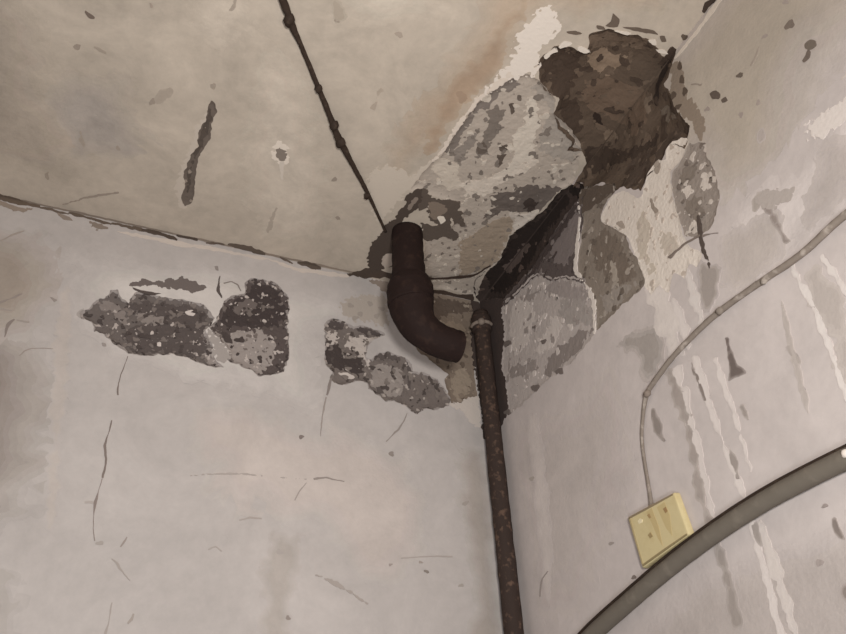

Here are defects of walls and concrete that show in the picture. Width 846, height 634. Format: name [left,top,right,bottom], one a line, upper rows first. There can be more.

crack [22,200,232,247]
spalling [80,276,290,377]
peeling [181,101,217,206]
crack [264,252,353,273]
peeling [324,5,720,415]
damp [380,0,668,176]
damp [573,202,597,334]
damp [617,134,846,524]
damp [511,360,640,627]